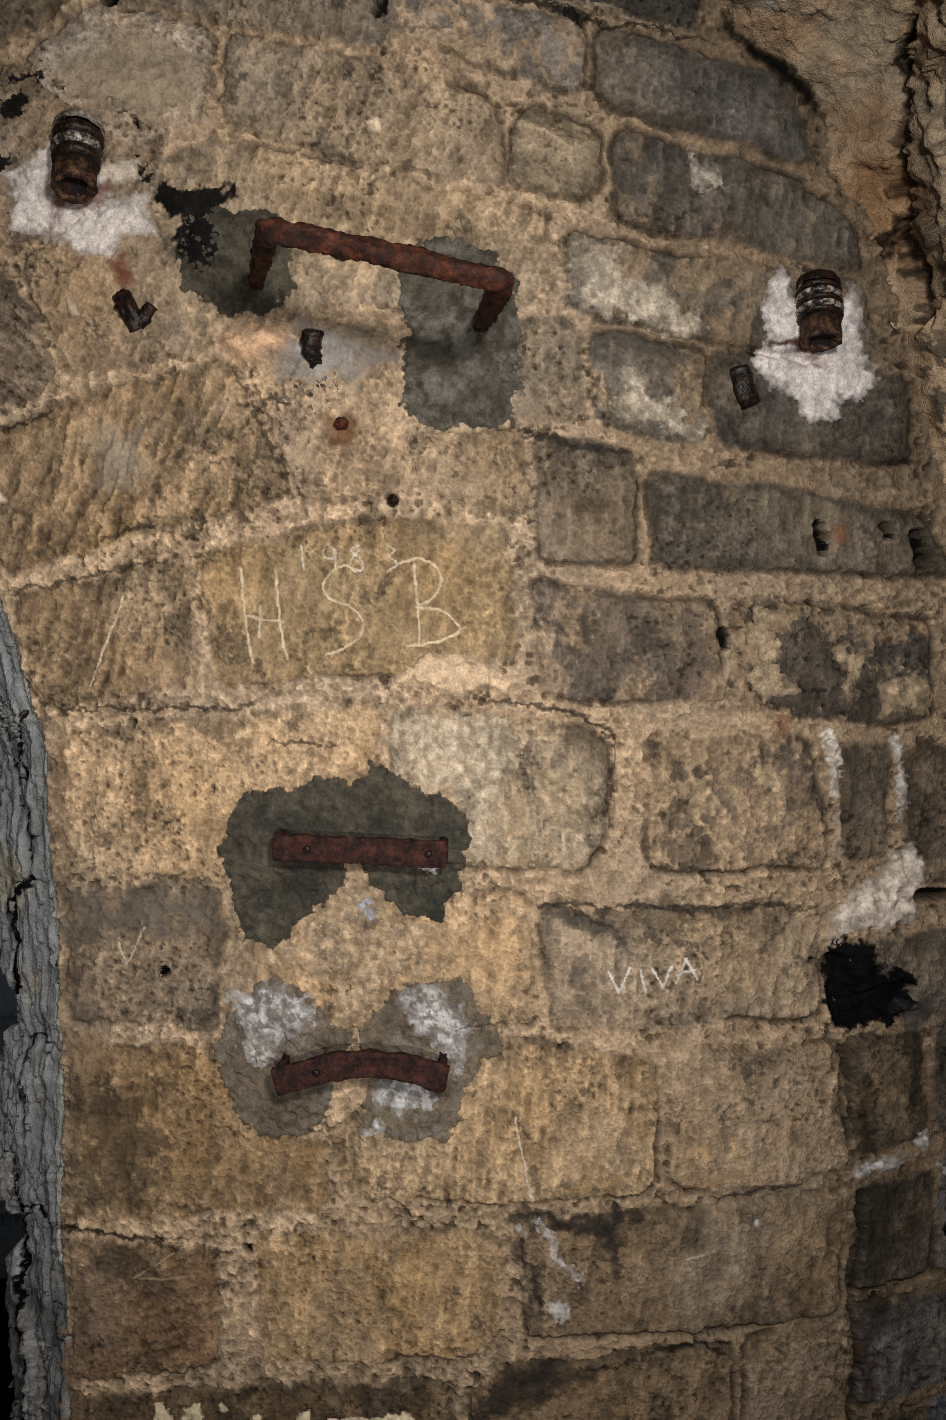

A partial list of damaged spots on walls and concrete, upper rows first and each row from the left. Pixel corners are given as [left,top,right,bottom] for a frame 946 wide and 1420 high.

crack [722,9,826,117]
crack [0,414,45,431]
crack [15,524,154,592]
crack [81,704,248,713]
crack [0,699,37,994]
water stain [829,847,925,946]